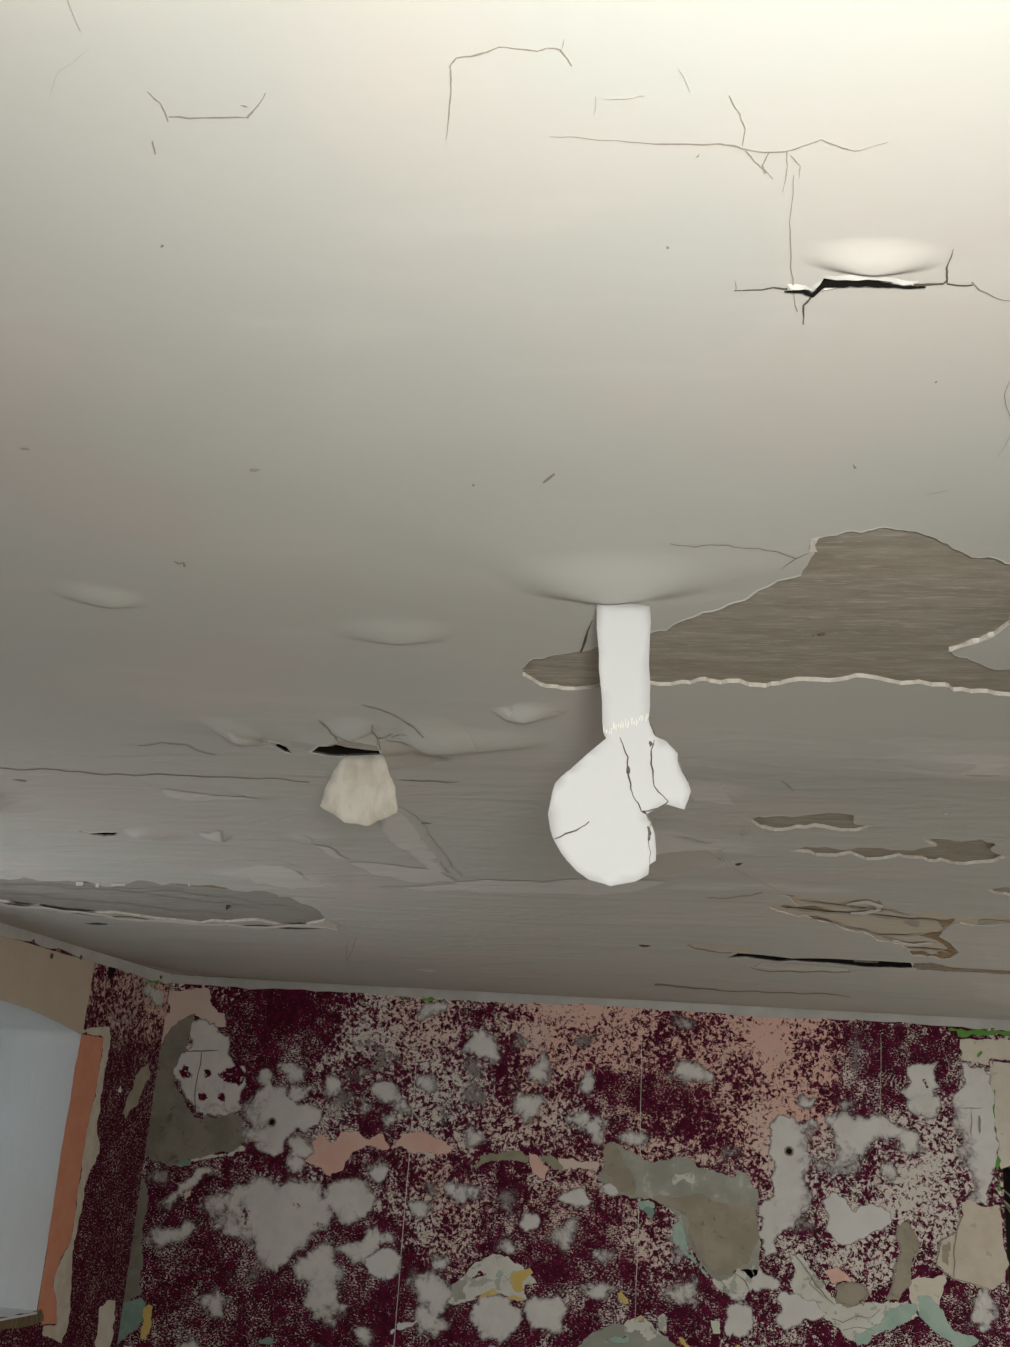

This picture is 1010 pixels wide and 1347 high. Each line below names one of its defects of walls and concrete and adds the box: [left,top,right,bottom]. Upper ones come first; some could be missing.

crack [148,92,266,122]
crack [446,41,572,139]
crack [550,95,1010,325]
peeling [320,526,1010,896]
peeling [0,877,340,931]
peeling [768,894,1010,960]
peeling [123,1014,245,1167]
peeling [447,1254,537,1305]
peeling [578,1313,676,1347]
peeling [598,1142,761,1300]
peeling [790,1222,920,1342]
peeling [936,1199,1009,1290]